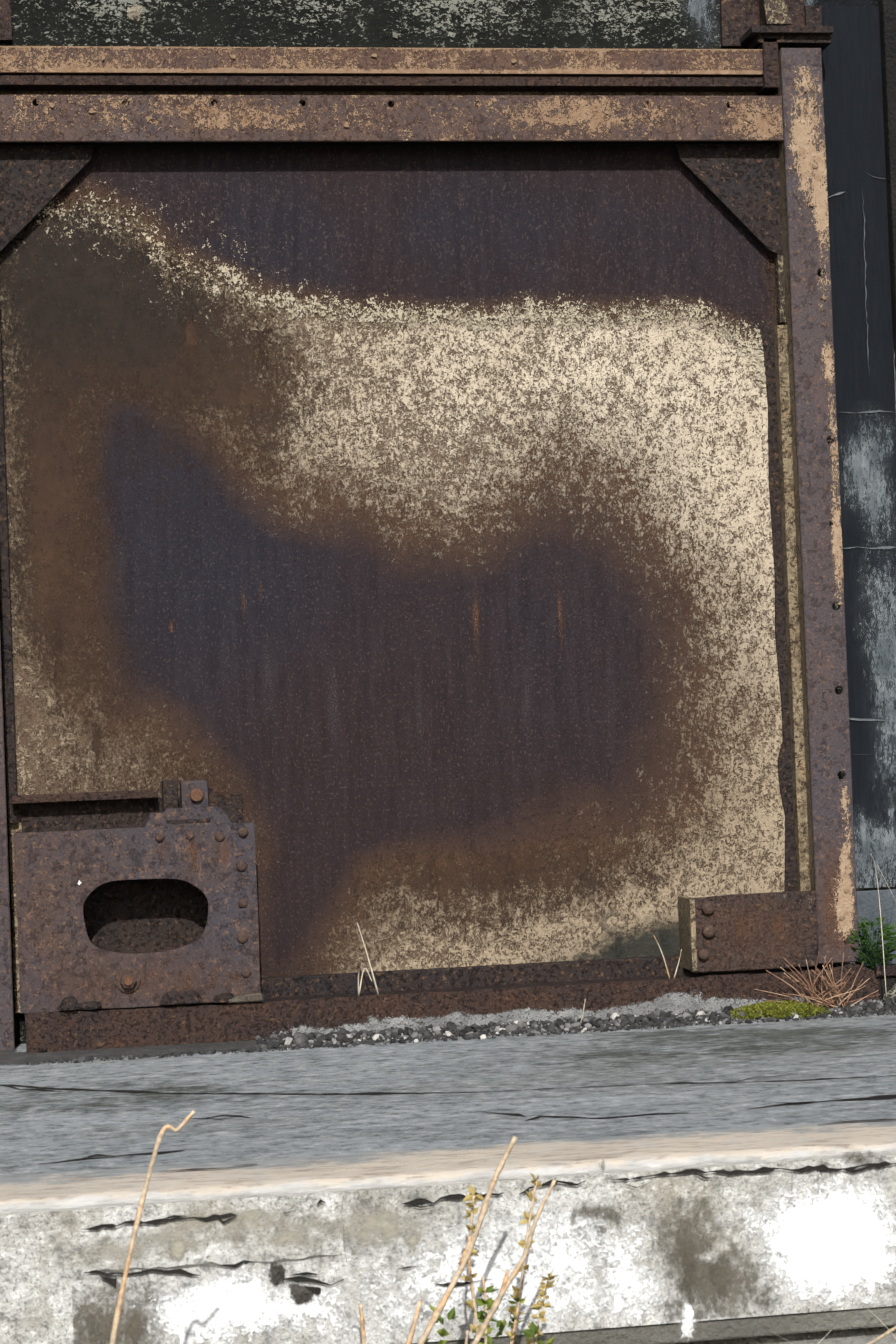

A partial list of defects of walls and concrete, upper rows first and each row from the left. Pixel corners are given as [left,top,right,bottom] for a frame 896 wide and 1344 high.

peeling [0,0,763,74]
corrosion [0,146,779,978]
crack [402,1161,896,1208]
crack [82,1213,237,1230]
crack [85,1260,253,1287]
crack [283,1272,344,1295]
leakage [72,1170,896,1344]